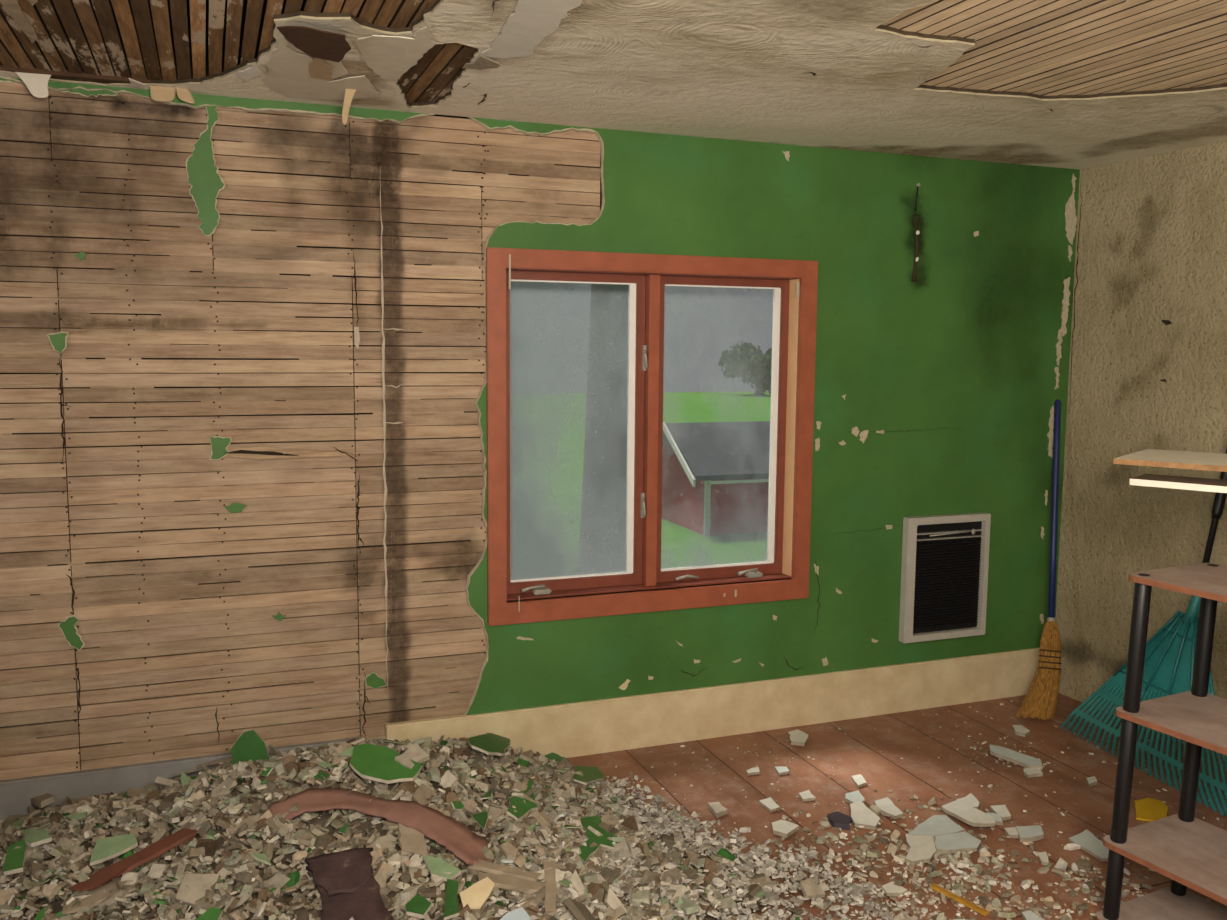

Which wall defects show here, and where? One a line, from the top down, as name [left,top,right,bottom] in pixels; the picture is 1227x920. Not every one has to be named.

spalling [873,0,1227,101]
spalling [1047,174,1083,458]
crack [59,357,71,465]
spalling [0,0,605,784]
leakage [320,120,408,723]
crack [66,574,75,615]
crack [74,663,82,717]